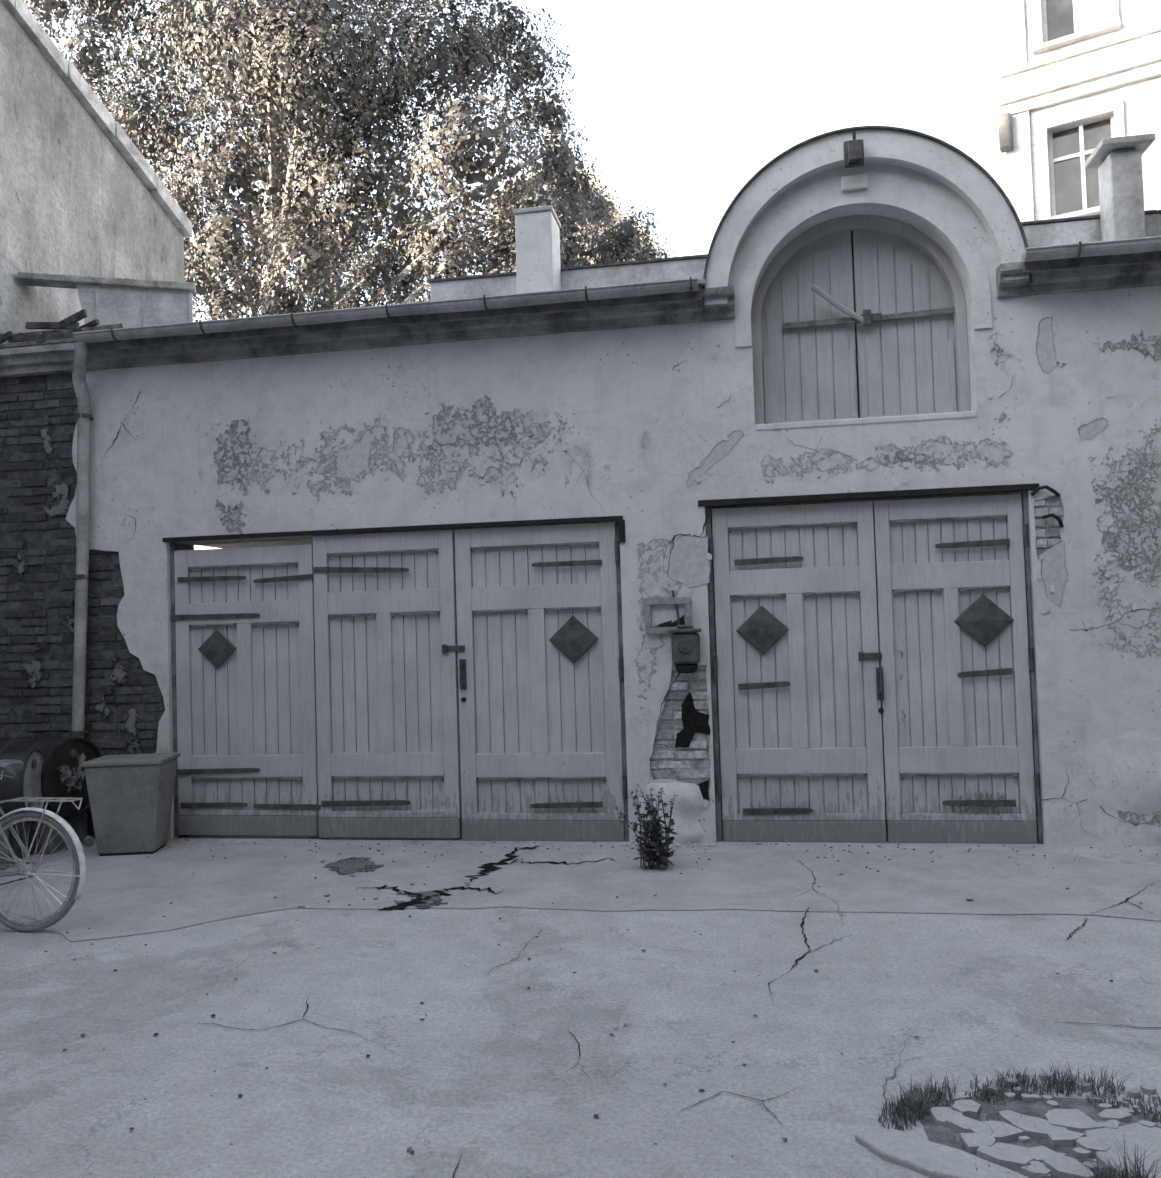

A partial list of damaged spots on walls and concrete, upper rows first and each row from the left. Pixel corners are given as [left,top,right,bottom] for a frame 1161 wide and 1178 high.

spalling [1036,313,1063,373]
peeling [198,395,593,533]
peeling [761,407,1014,484]
flaking render [0,372,165,793]
peeling [633,531,712,723]
spalling [1028,495,1070,614]
peeling [1080,418,1161,659]
flaking render [650,664,711,805]
flaking render [84,808,95,838]
crack [357,845,613,910]
crack [768,857,852,1009]
crack [1067,880,1160,940]